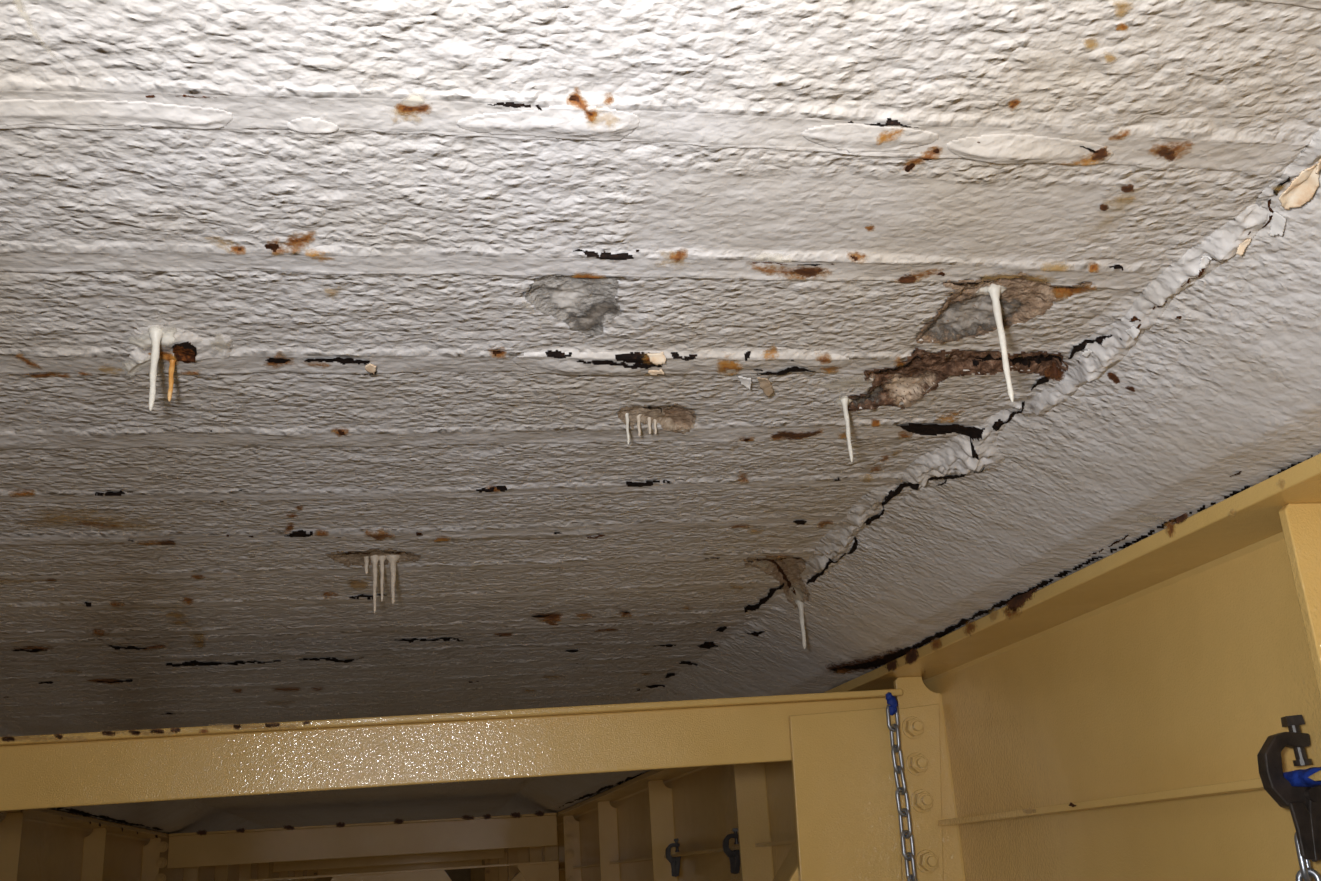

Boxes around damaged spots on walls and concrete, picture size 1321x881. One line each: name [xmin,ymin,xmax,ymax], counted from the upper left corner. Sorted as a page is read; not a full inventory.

corrosion [567,90,612,122]
crack [848,118,918,128]
corrosion [1062,131,1128,166]
corrosion [264,232,332,260]
crack [573,249,639,260]
corrosion [752,258,833,279]
spalling [524,274,622,337]
spalling [827,272,1096,412]
spalling [617,403,696,445]
crack [637,199,1321,691]
crack [626,479,670,487]
spalling [325,548,421,614]